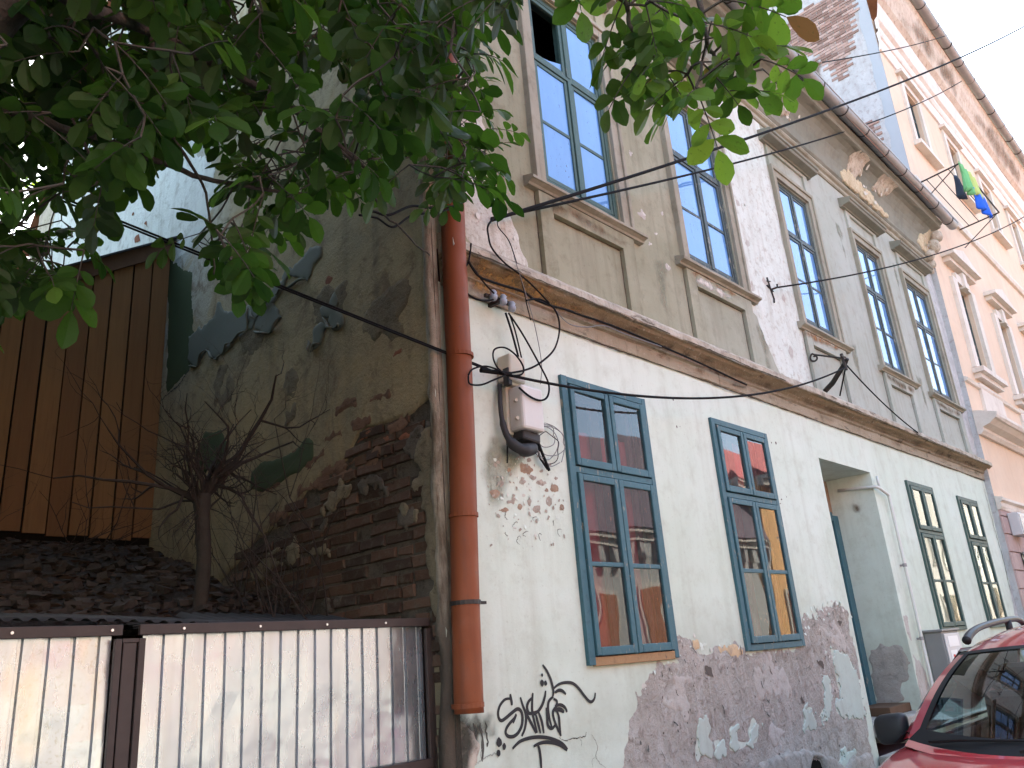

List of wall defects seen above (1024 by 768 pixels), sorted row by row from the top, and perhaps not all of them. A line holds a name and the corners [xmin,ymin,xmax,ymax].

flaking render [787,0,860,82]
flaking render [840,150,898,218]
peeling [188,246,322,411]
flaking render [306,280,348,352]
flaking render [229,397,441,683]
peeling [487,447,565,547]
flaking render [623,600,930,768]